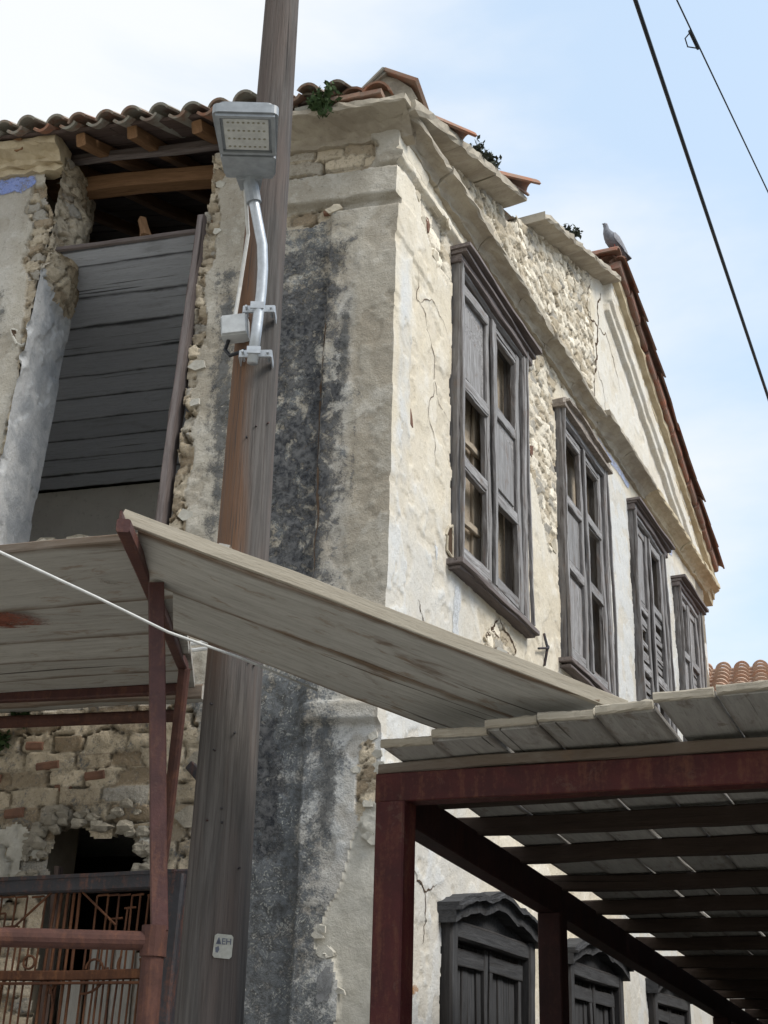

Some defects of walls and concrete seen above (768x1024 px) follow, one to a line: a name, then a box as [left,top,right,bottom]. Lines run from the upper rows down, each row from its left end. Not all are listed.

crack [587,286,620,392]
water stain [269,236,359,585]
spalling [483,618,517,656]
flaking render [0,705,150,877]
flaking render [166,704,199,869]
water stain [253,708,293,865]
water stain [310,734,341,834]
flaking render [0,895,47,928]
peeling [311,731,385,1024]
crack [415,872,437,943]
flaking render [0,947,40,1024]